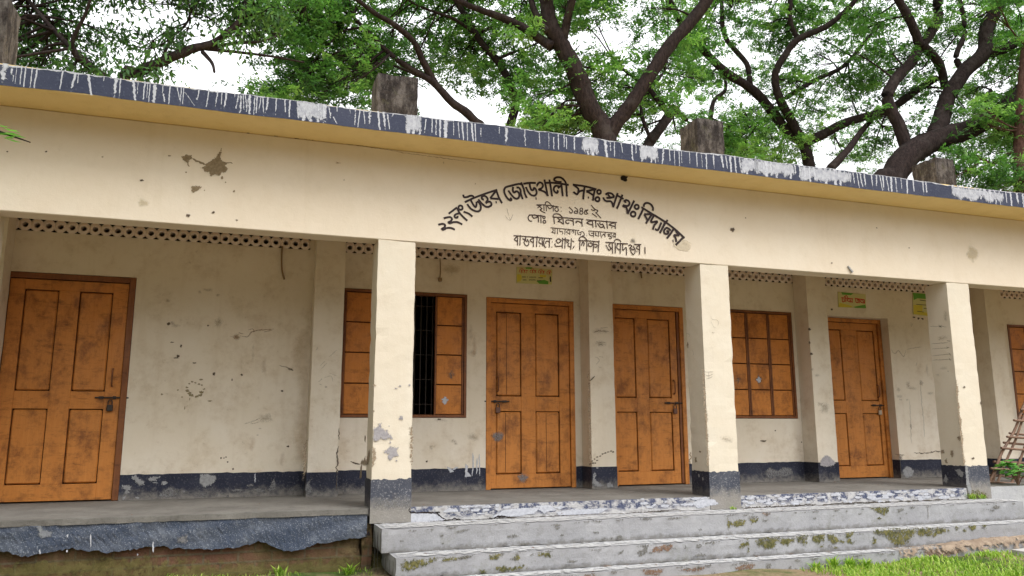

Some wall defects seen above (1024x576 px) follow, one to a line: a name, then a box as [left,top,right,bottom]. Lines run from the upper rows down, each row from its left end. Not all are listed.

damp [11,65,38,88]
damp [137,80,200,106]
damp [215,91,337,123]
damp [354,108,394,130]
damp [406,115,482,141]
damp [553,134,927,194]
damp [952,185,1024,208]
peeling [360,410,413,478]
peeling [380,370,1017,528]
peeling [122,474,276,500]